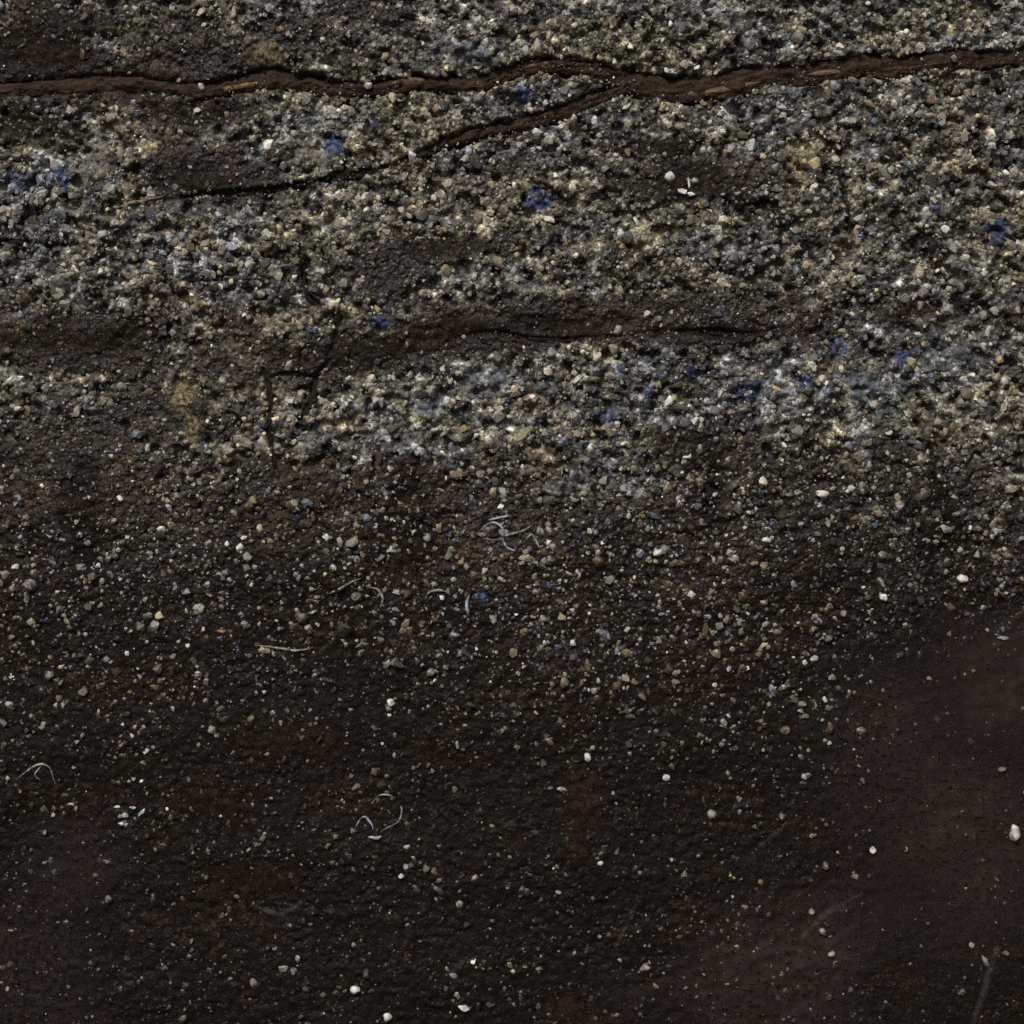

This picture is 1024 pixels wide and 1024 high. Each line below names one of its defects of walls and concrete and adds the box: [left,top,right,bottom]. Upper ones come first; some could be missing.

crack [0,50,1024,199]
crack [836,125,851,235]
crack [457,332,585,343]